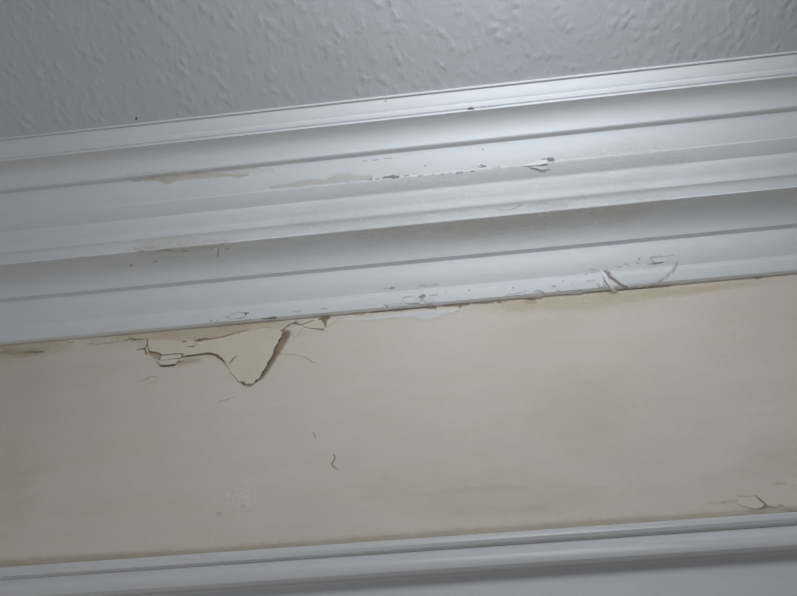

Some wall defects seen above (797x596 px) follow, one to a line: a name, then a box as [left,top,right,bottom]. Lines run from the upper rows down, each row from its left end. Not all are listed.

peeling [525,158,554,172]
peeling [587,255,677,293]
peeling [384,284,438,308]
leakage [507,284,732,309]
peeling [124,308,337,385]
crack [737,495,797,512]